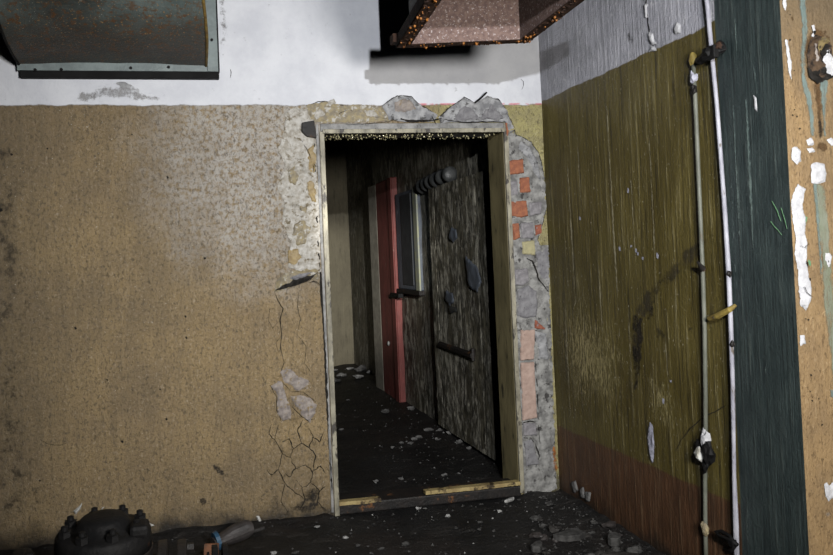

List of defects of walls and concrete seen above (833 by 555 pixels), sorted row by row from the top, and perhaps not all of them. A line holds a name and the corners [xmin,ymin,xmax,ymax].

peeling [791,138,833,165]
water stain [609,152,617,282]
peeling [791,162,827,320]
crack [269,294,310,376]
flaking render [278,95,557,494]
peeling [270,368,317,423]
crack [267,422,326,512]